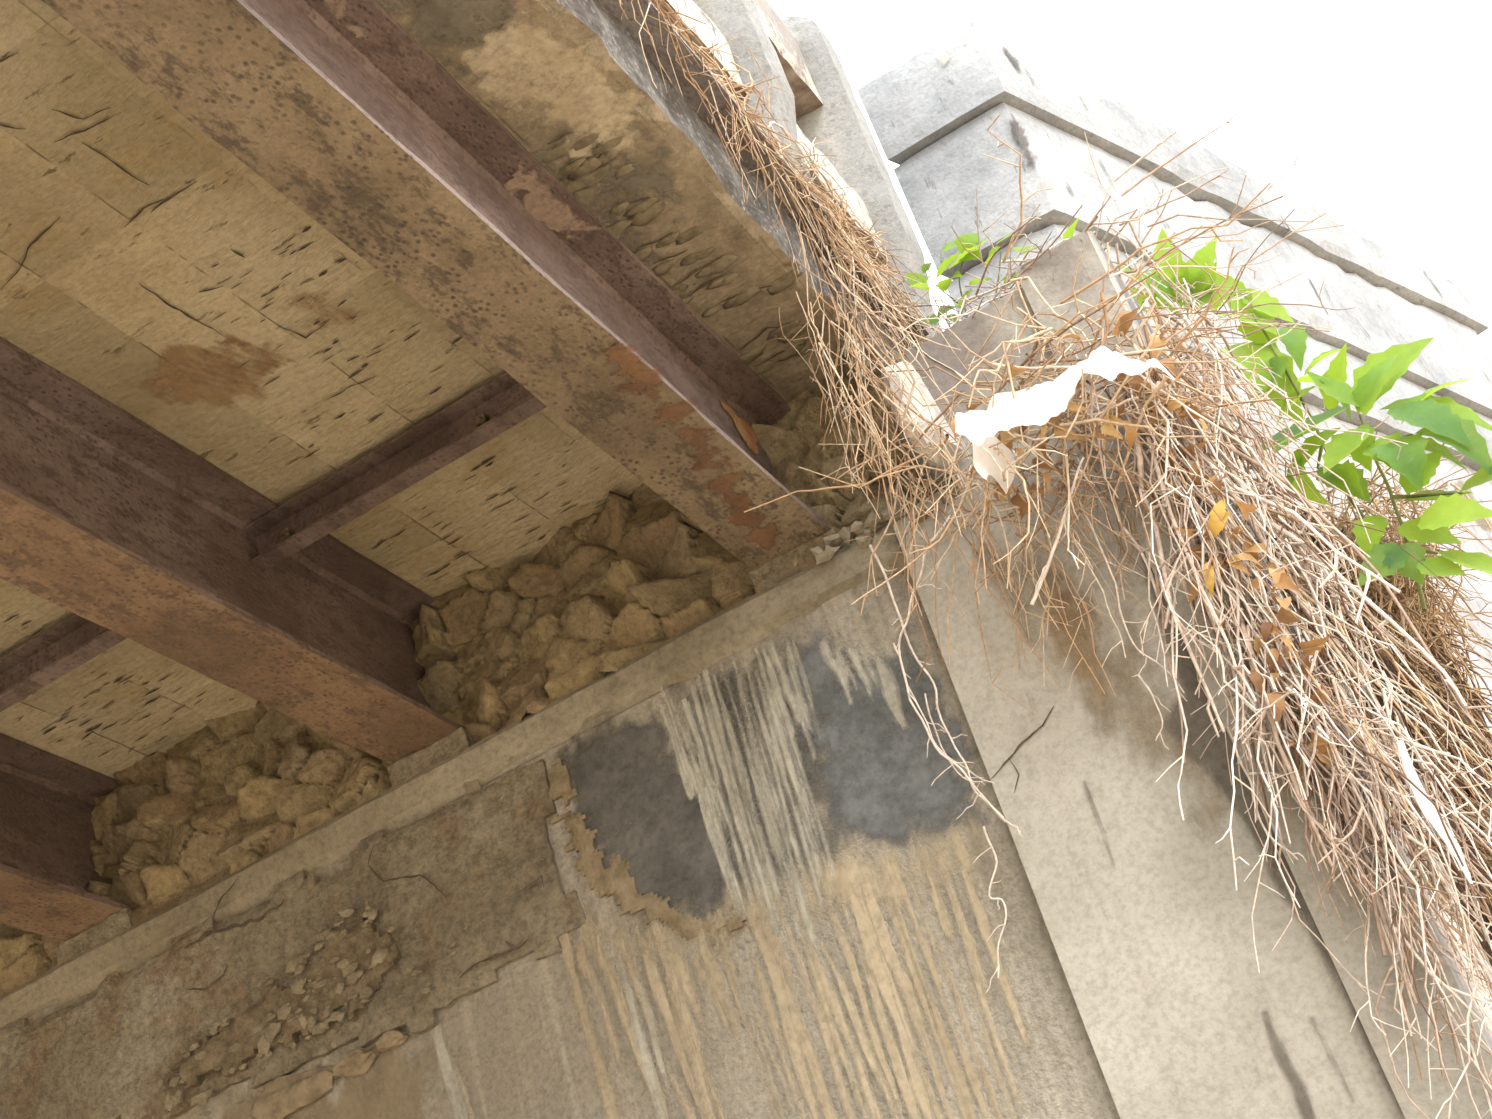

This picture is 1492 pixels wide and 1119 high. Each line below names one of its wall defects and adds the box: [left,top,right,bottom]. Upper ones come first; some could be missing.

peeling [324,0,365,38]
leakage [379,0,515,75]
crack [368,845,448,901]
peeling [548,757,748,945]
leakage [558,627,1030,1119]
crack [185,879,285,991]
spalling [150,900,431,1119]
crack [460,940,528,978]